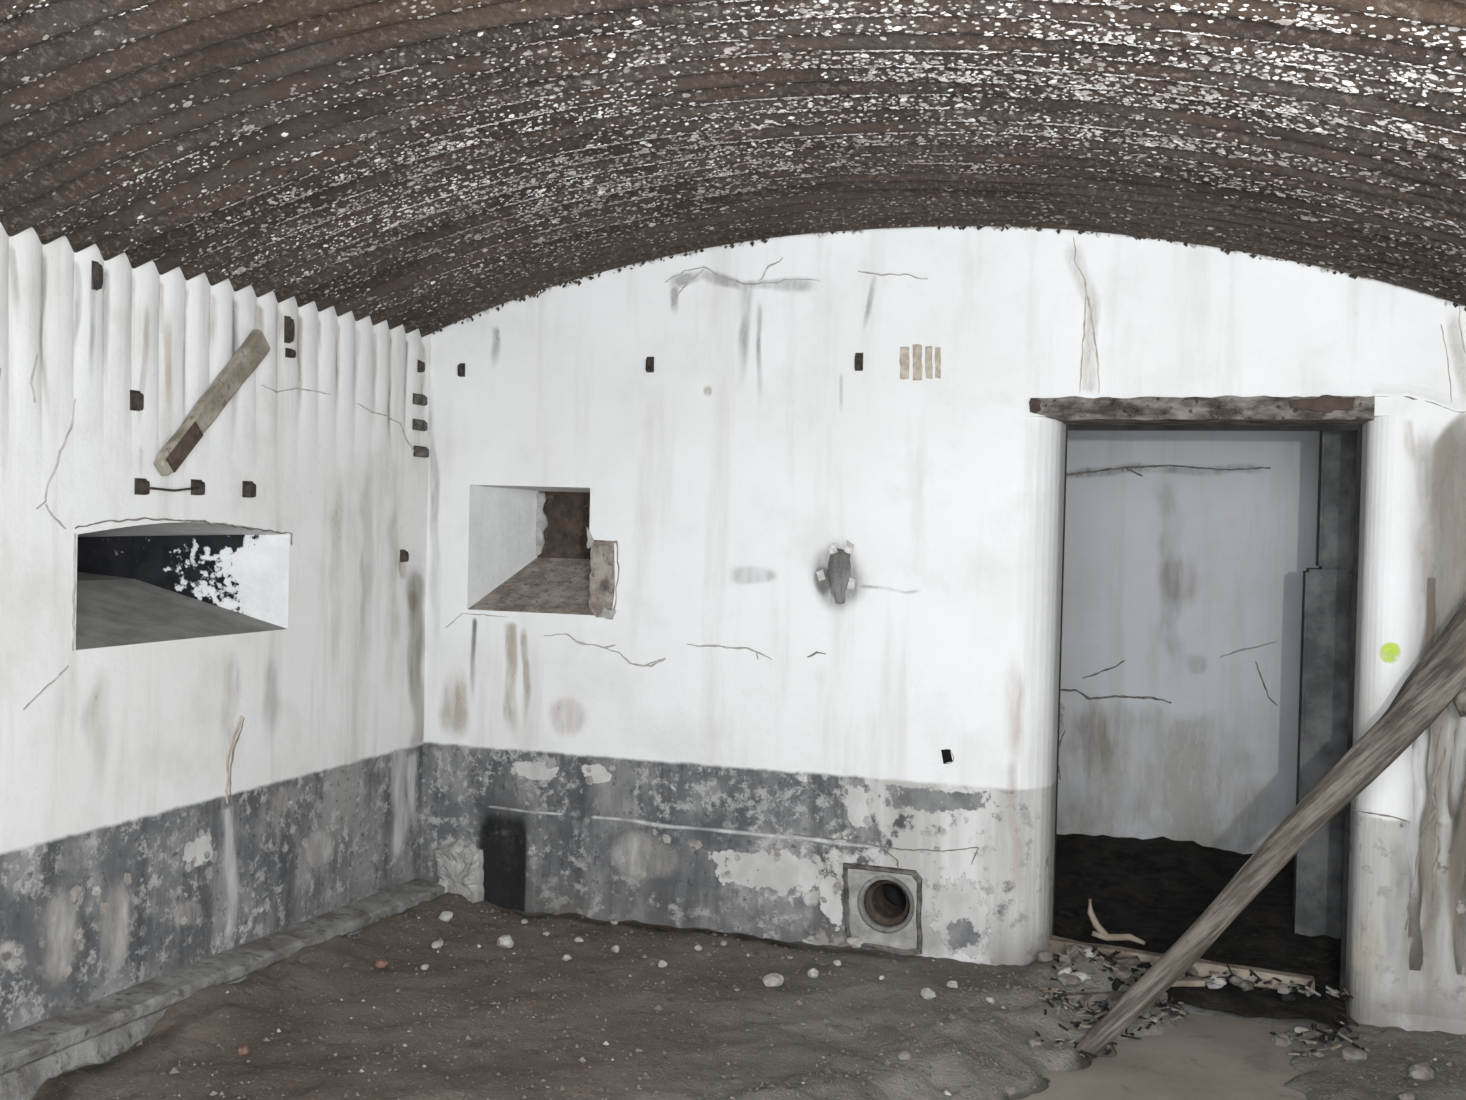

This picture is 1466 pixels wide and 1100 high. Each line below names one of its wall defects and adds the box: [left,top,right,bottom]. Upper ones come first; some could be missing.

crack [1066,464,1271,477]
spalling [816,540,857,604]
crack [544,633,772,667]
crack [1060,660,1172,704]
crack [1220,641,1278,706]
peeling [511,757,559,781]
peeling [582,763,616,785]
peeling [842,784,873,830]
peeling [181,833,217,872]
peeling [614,832,844,931]
peeling [45,873,132,979]
peeling [929,873,996,965]